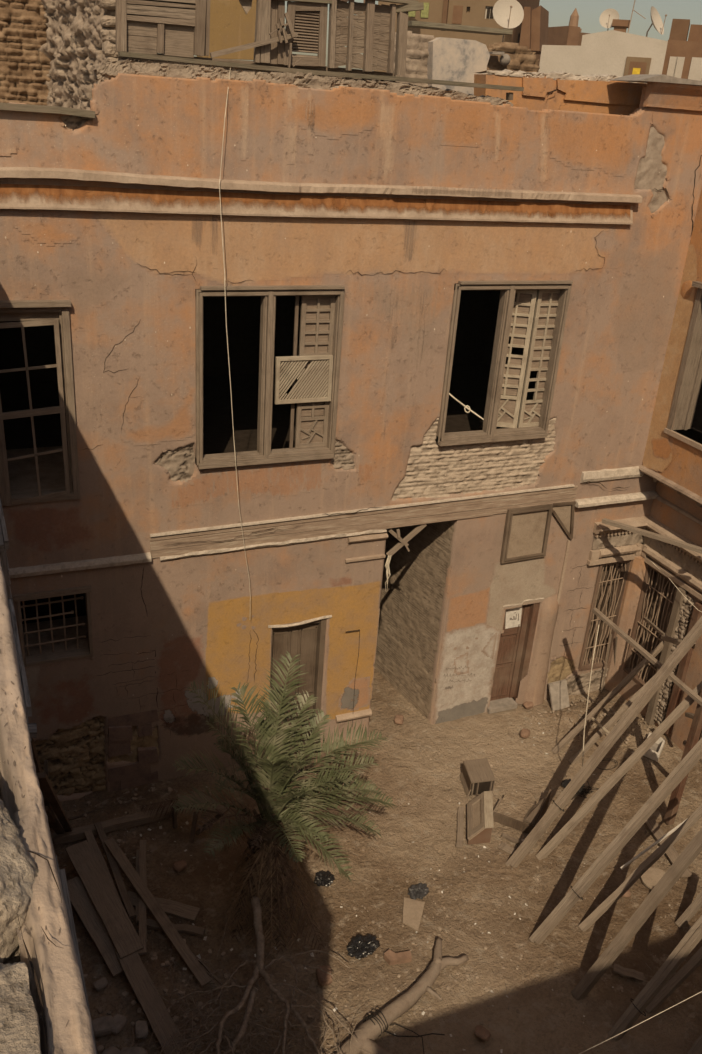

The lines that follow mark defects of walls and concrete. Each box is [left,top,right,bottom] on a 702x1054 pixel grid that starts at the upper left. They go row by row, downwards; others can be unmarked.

spalling [634,122,671,218]
crack [656,155,702,234]
crack [103,319,141,429]
spalling [154,443,195,485]
spalling [392,418,556,501]